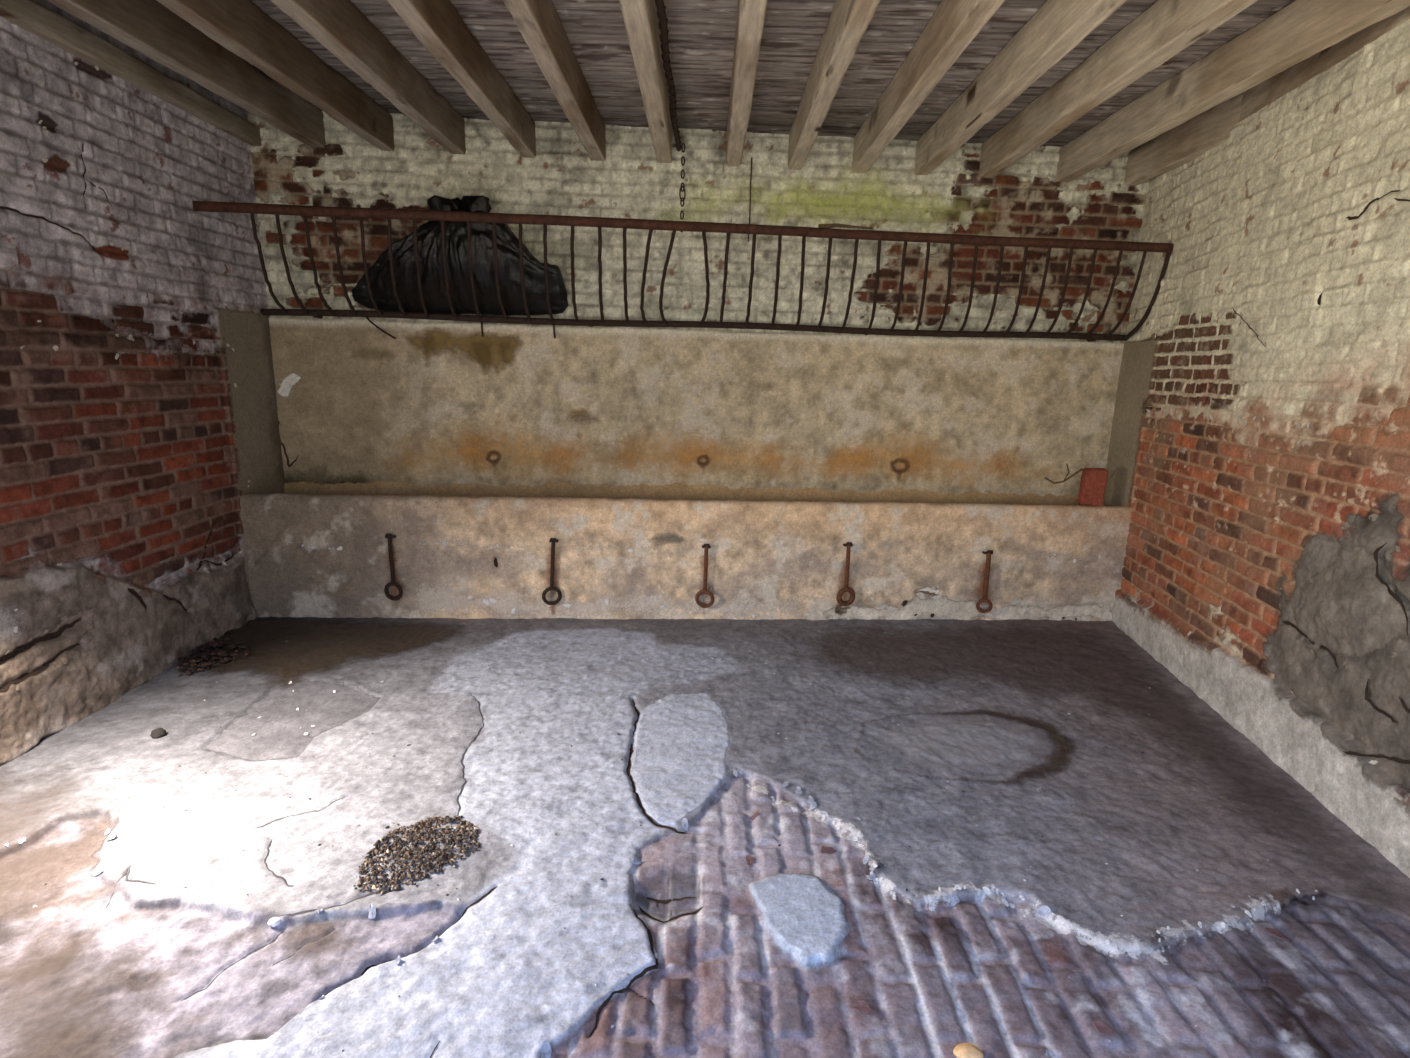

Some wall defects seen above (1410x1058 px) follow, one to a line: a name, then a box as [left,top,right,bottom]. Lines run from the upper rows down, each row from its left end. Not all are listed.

peeling [92,243,129,261]
crack [1346,190,1410,220]
leakage [407,330,520,371]
peeling [0,281,250,596]
peeling [823,144,1410,671]
crack [0,618,81,692]
crack [626,699,690,834]
leakage [818,630,1323,846]
leakage [0,785,61,887]
spalling [541,773,1410,1058]
leakage [0,949,112,1058]